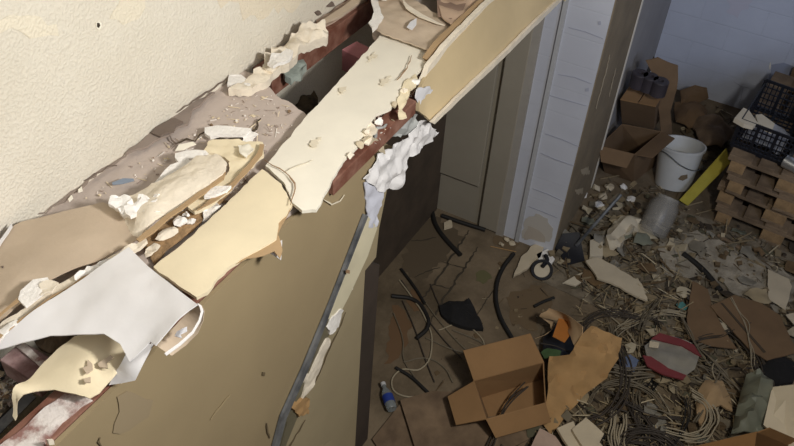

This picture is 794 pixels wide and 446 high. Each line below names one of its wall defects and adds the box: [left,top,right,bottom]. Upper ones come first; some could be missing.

spalling [125,92,215,155]
crack [416,230,478,322]